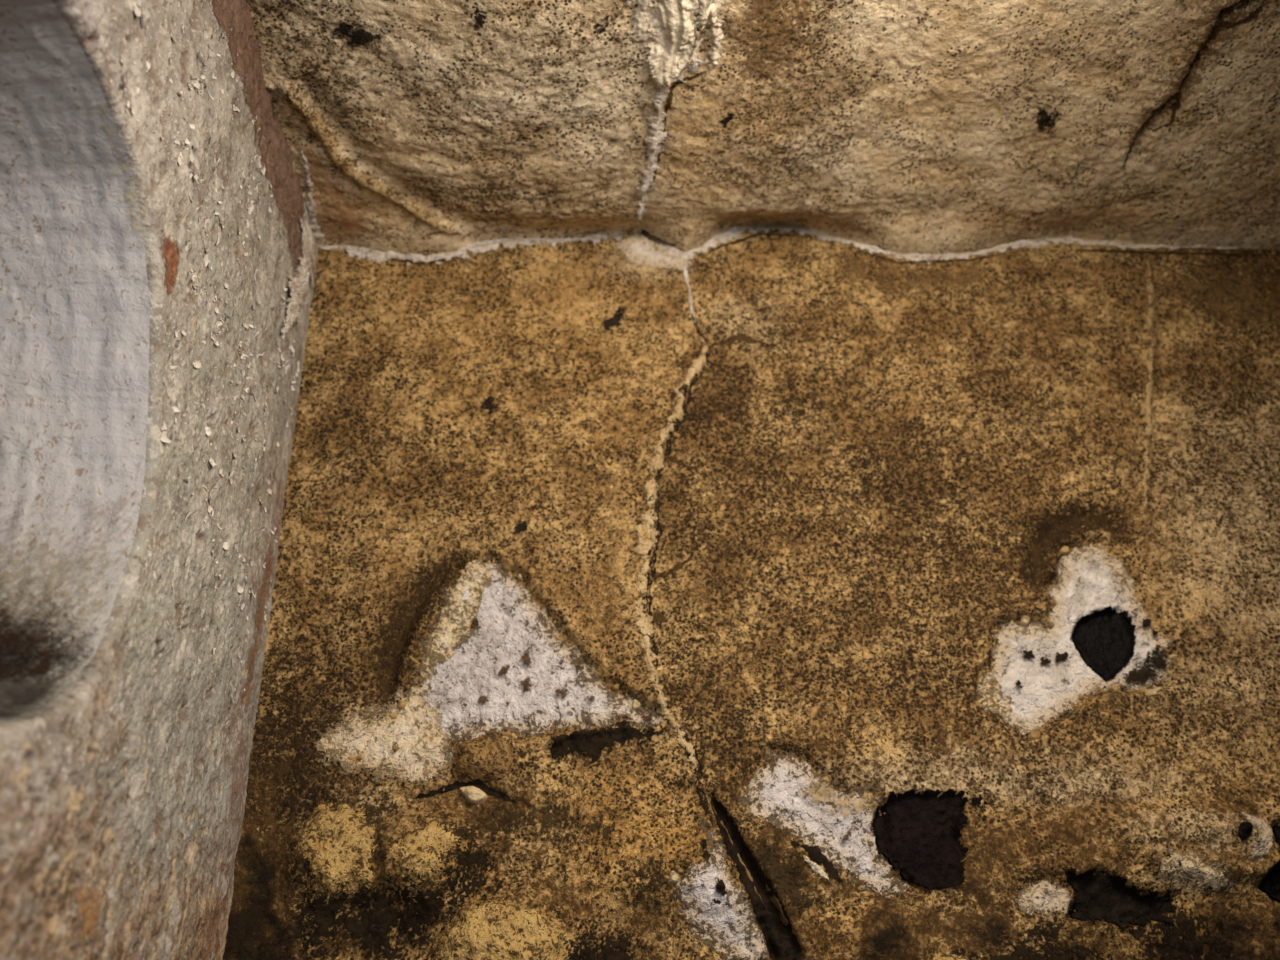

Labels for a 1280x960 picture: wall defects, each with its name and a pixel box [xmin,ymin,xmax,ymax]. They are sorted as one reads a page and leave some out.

crack [1123,0,1272,167]
crack [319,54,1272,960]
leakage [0,528,131,691]
spalling [310,554,664,804]
spalling [976,541,1179,738]
leakage [265,778,708,960]
spalling [663,816,771,960]
spalling [737,744,910,899]
leakage [872,788,988,891]
leakage [1238,822,1253,840]
spalling [1238,800,1274,863]
leakage [1260,863,1280,903]